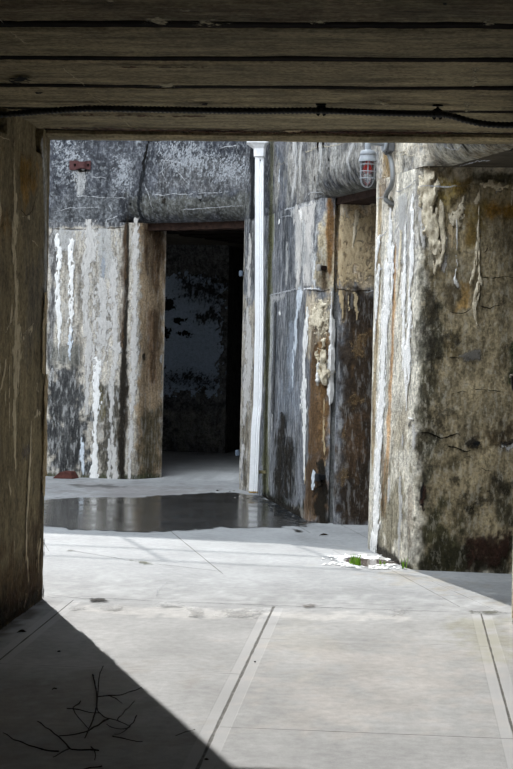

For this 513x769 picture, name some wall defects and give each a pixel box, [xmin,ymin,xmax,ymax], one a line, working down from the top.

leakage [156,141,255,220]
leakage [0,138,162,580]
leakage [241,233,255,428]
leakage [255,142,316,532]
corrosion [306,327,330,524]
leakage [334,193,461,569]
leakage [459,476,509,514]